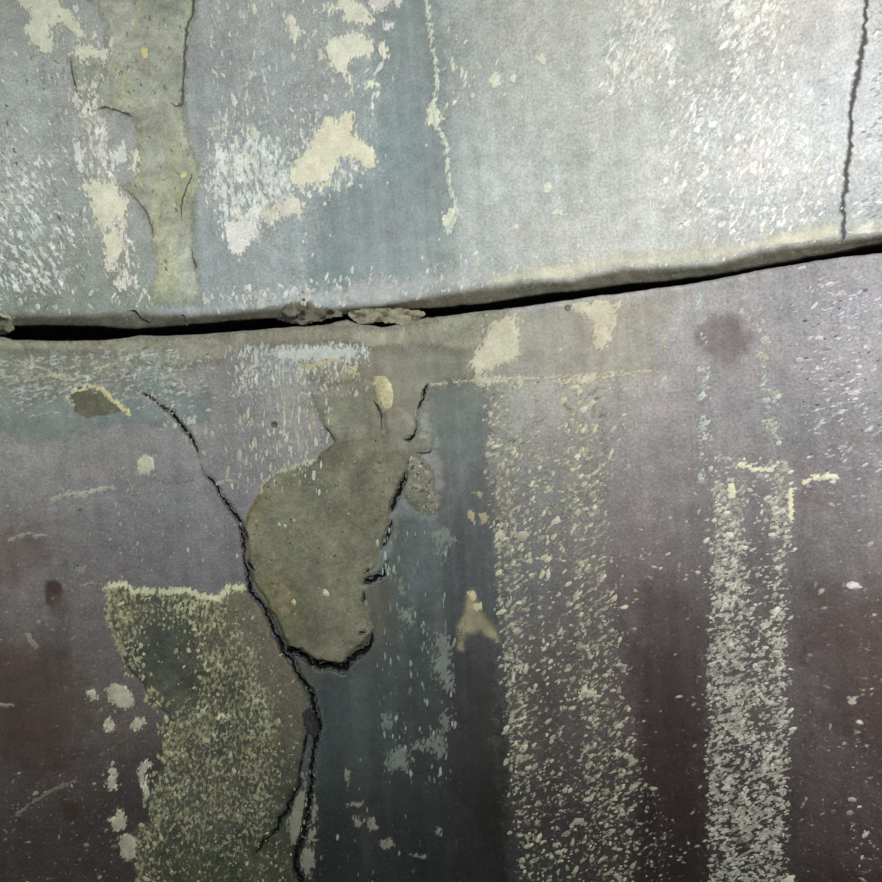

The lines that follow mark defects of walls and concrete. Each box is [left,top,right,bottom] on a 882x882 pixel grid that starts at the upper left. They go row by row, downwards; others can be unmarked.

crack [70,58,134,118]
crack [171,0,197,108]
crack [838,0,870,241]
peeling [277,291,425,325]
spalling [67,382,131,418]
peeling [373,376,394,411]
crack [127,381,378,882]
damp [285,292,814,882]
damp [808,529,882,659]
peeling [102,580,320,882]
damp [810,670,882,768]
damp [820,797,882,882]